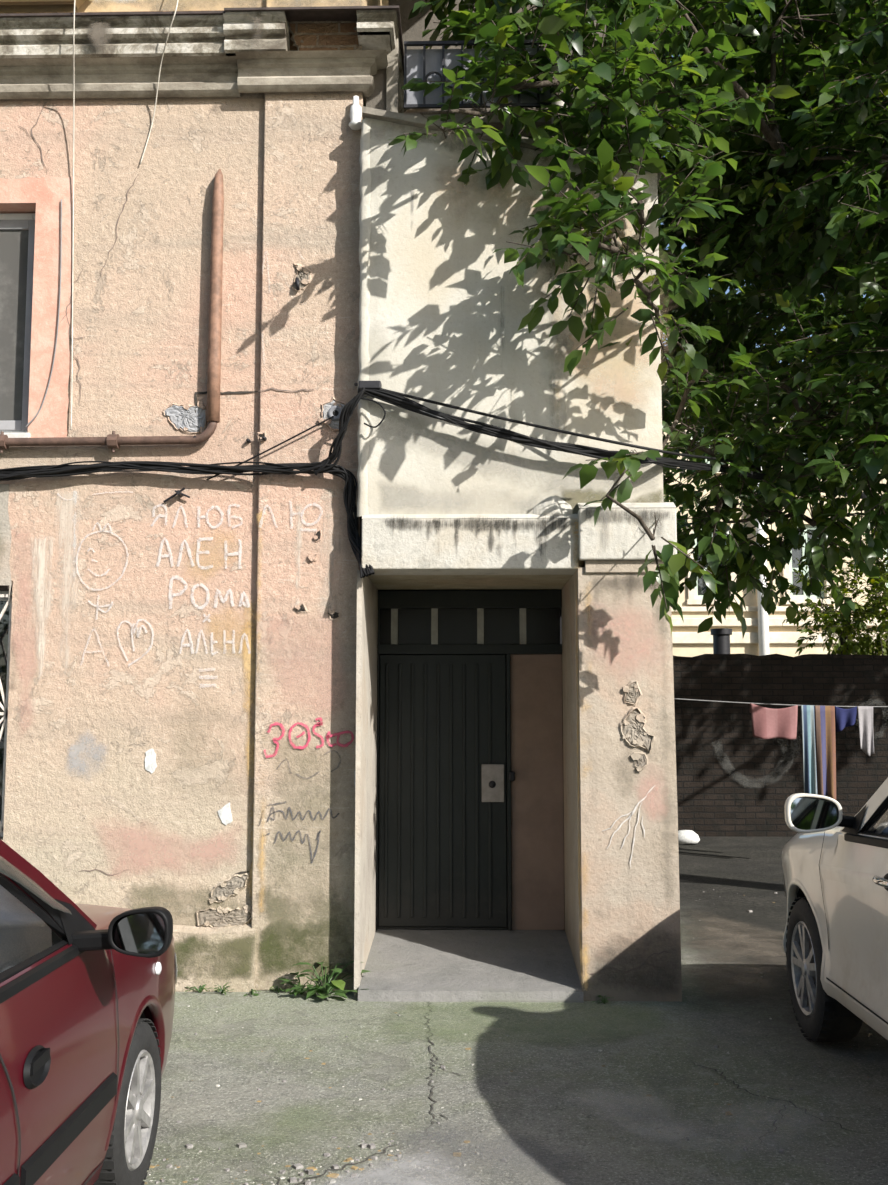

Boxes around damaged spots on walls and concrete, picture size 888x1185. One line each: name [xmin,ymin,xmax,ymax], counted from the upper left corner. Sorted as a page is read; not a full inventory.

water stain [383,487,570,552]
spalling [619,680,656,773]
spalling [195,873,252,928]
water stain [598,935,676,991]